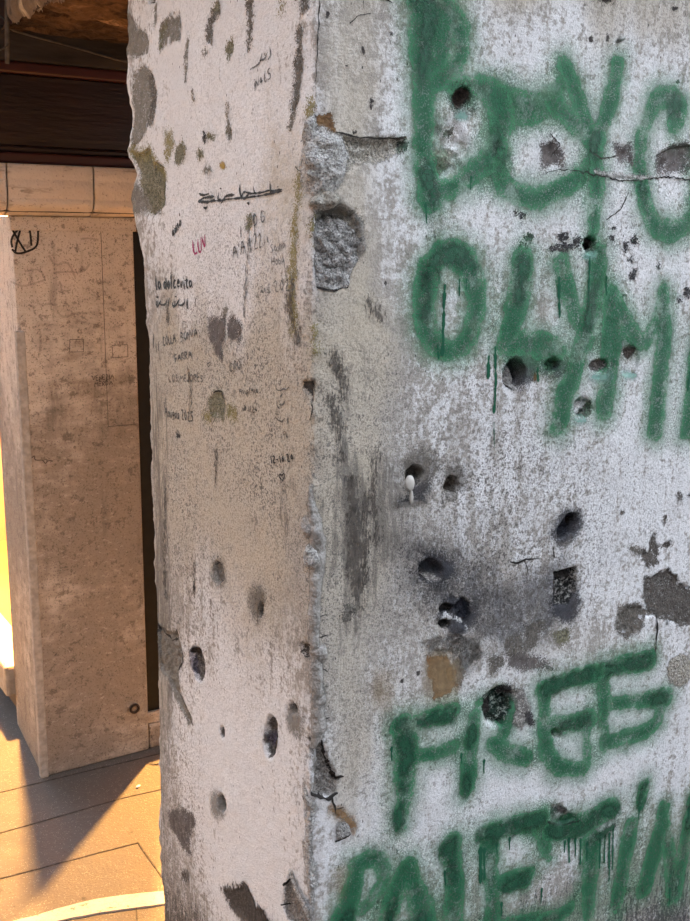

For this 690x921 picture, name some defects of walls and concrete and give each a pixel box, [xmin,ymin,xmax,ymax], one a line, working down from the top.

crack [541,133,690,220]
spalling [305,202,367,292]
spalling [623,347,636,378]
peeling [613,514,690,652]
spalling [157,621,193,726]
spalling [281,737,344,921]
peeling [220,881,268,921]